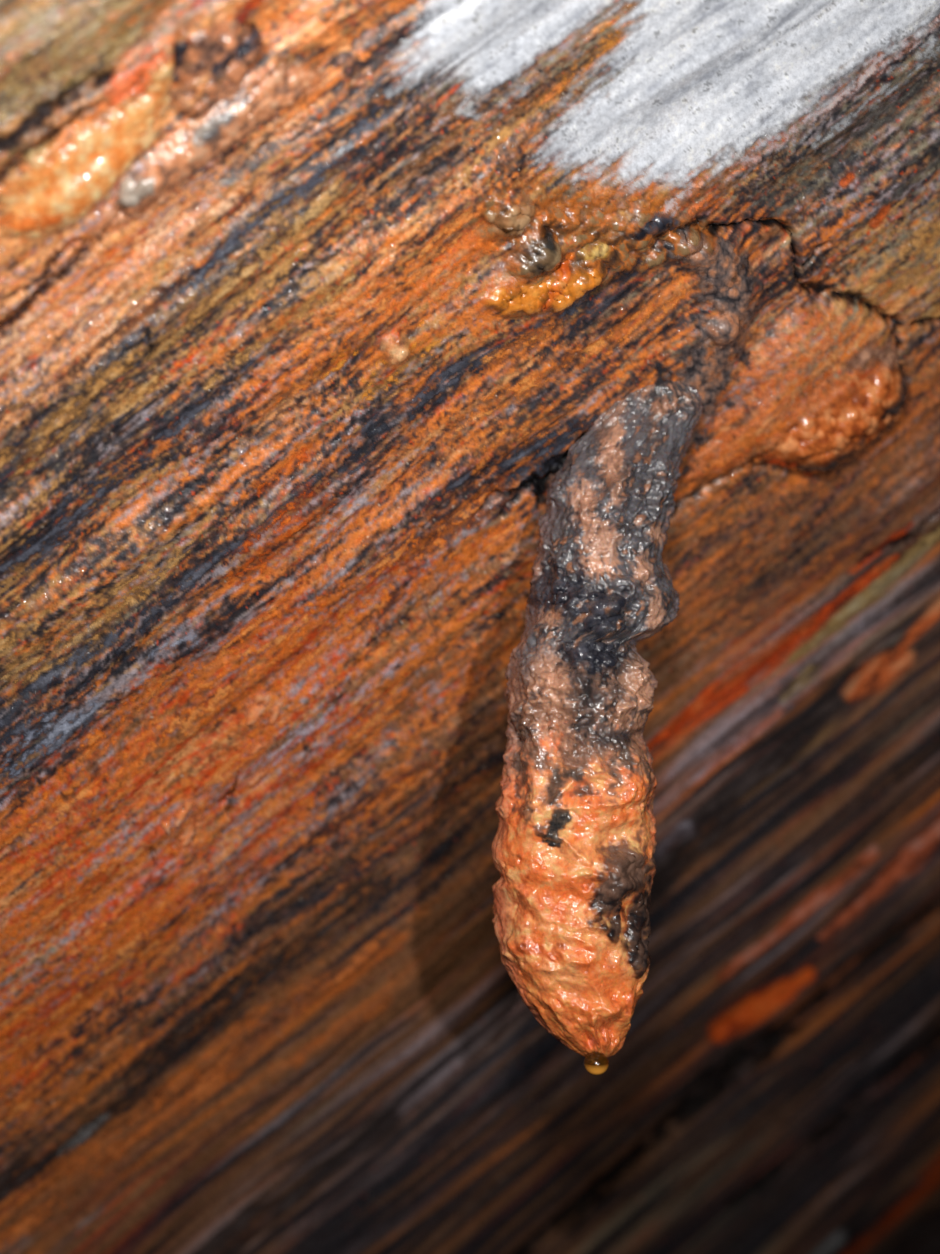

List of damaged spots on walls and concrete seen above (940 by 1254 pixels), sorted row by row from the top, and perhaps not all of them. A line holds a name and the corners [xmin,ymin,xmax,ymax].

corrosion [265,12,370,92]
corrosion [732,36,918,174]
corrosion [0,113,302,377]
corrosion [274,211,563,409]
leakage [0,0,940,496]
corrosion [454,288,686,432]
crack [657,218,932,378]
corrosion [0,483,497,861]
corrosion [647,522,913,751]
corrosion [844,599,940,701]
corrosion [718,818,940,978]
corrosion [710,967,815,1041]